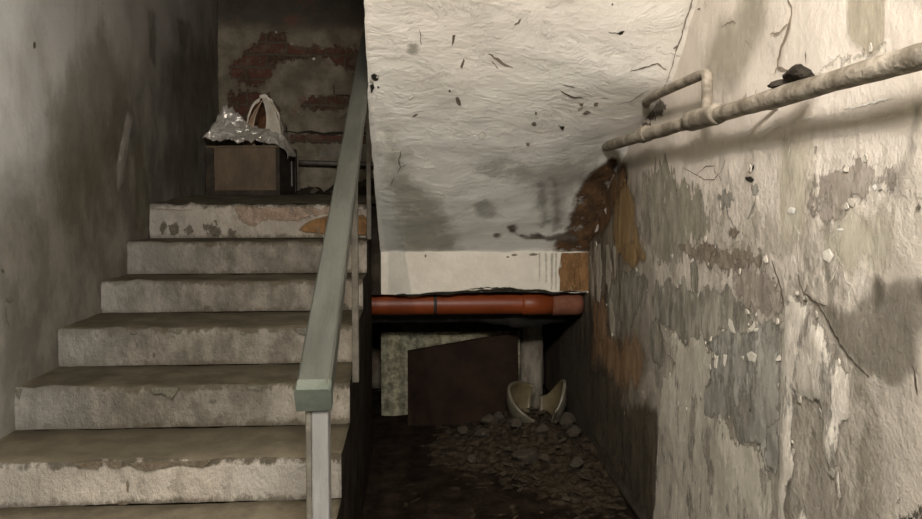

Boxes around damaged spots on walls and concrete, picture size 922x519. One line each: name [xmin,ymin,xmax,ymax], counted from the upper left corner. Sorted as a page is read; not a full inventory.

flaking render [227,31,359,122]
crack [618,0,693,105]
crack [771,0,806,72]
water stain [848,0,884,52]
peeling [148,221,236,238]
peeling [235,206,330,226]
rust [555,158,646,291]
peeling [807,154,897,231]
peeling [590,154,783,519]
crack [772,262,869,377]
peeling [72,459,211,471]